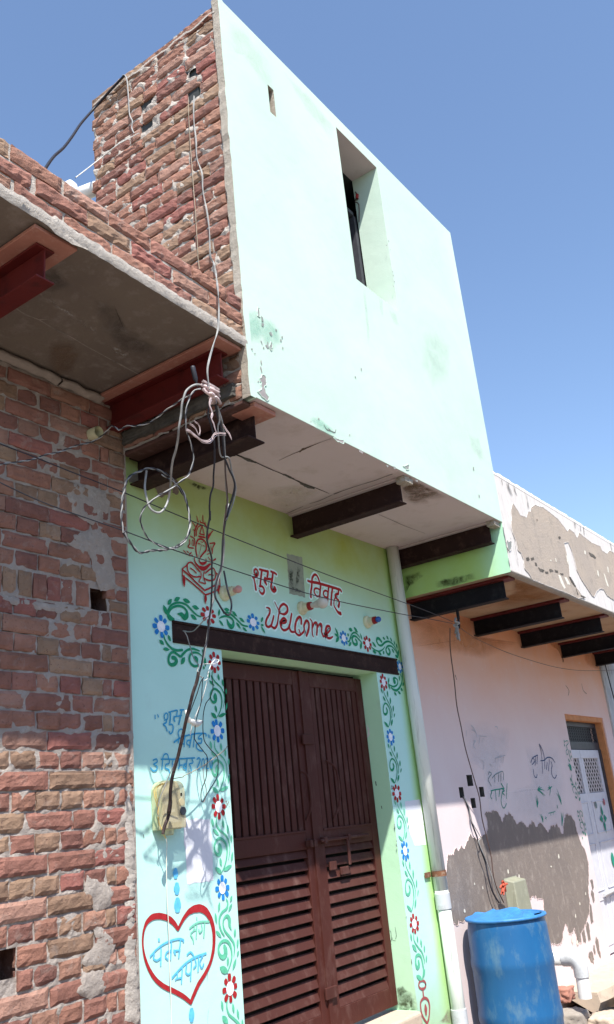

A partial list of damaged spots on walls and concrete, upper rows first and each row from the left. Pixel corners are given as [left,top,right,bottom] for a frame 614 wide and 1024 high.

peeling [251,307,283,401]
crack [236,425,392,514]
peeling [506,503,614,600]
peeling [446,810,601,964]